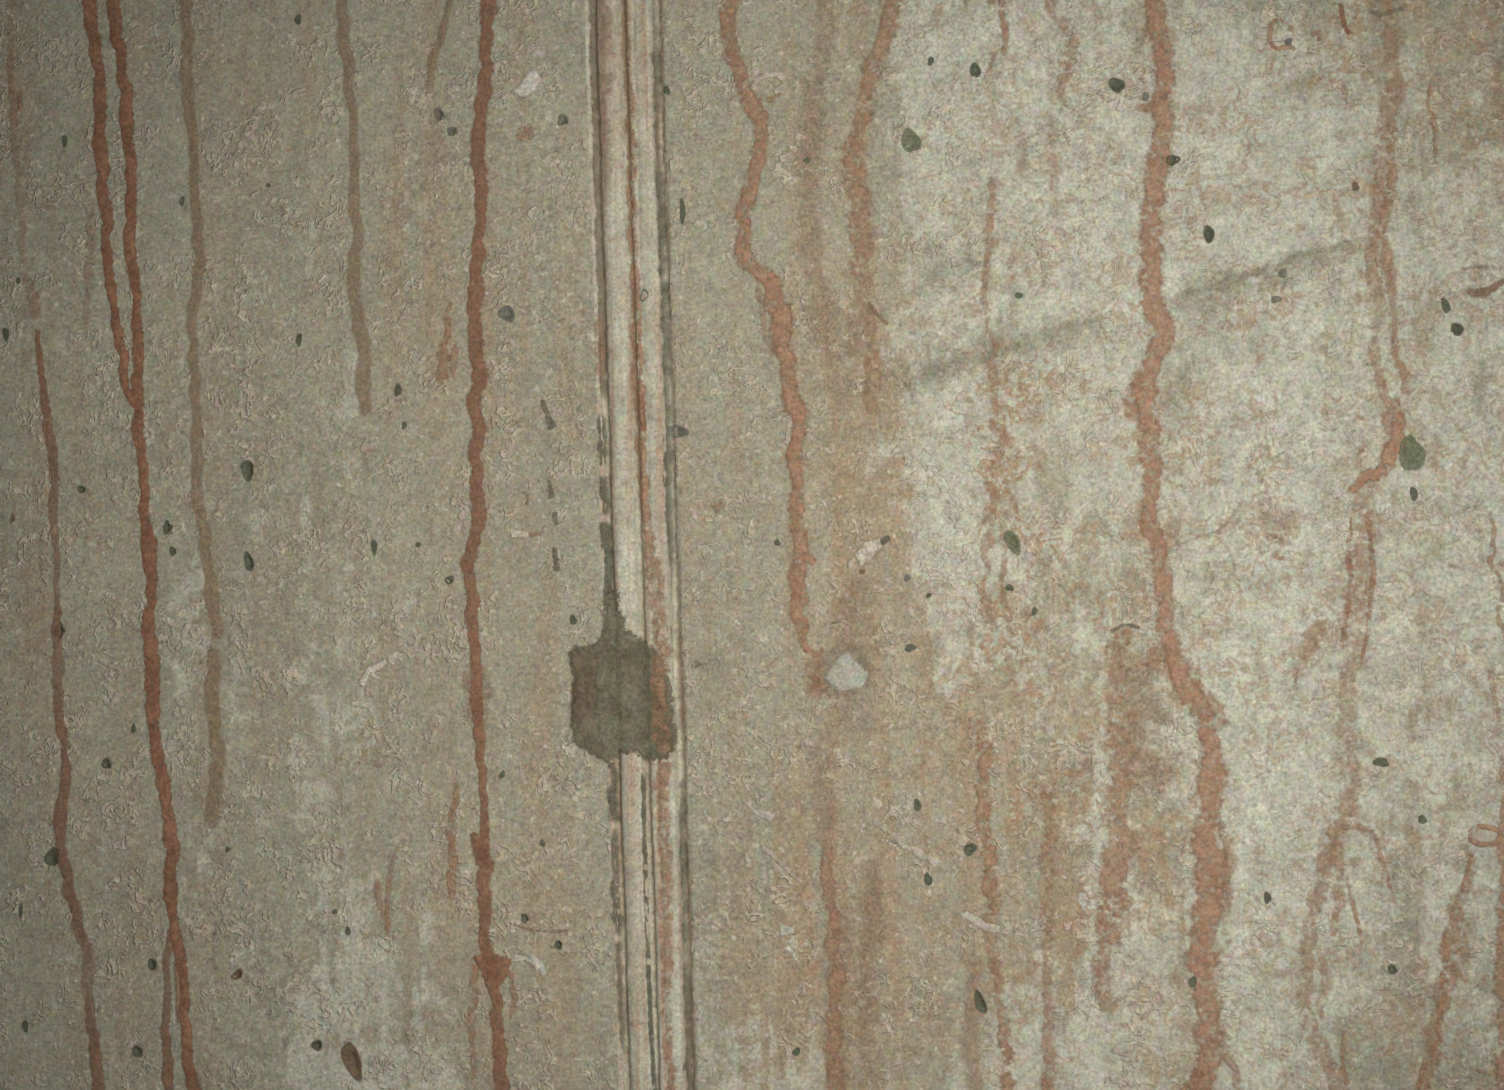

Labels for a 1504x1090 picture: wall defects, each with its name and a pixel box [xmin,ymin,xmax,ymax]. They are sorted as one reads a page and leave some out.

rust [844,0,902,259]
rust [35,333,58,491]
rust [182,2,225,812]
rust [720,0,827,692]
rust [1348,332,1409,493]
rust [82,0,201,1090]
rust [437,0,516,1090]
damp [570,588,679,763]
rust [1124,0,1228,1090]
rust [1342,523,1376,657]
rust [53,693,85,941]
rust [1331,825,1392,937]